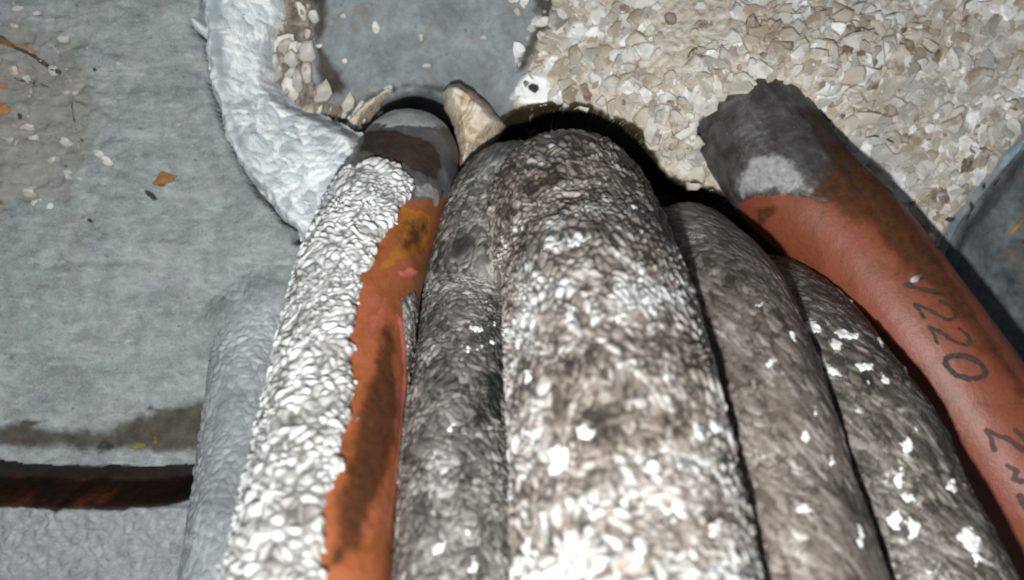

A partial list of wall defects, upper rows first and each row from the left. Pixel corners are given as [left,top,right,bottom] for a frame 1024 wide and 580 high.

water stain [0,403,203,451]